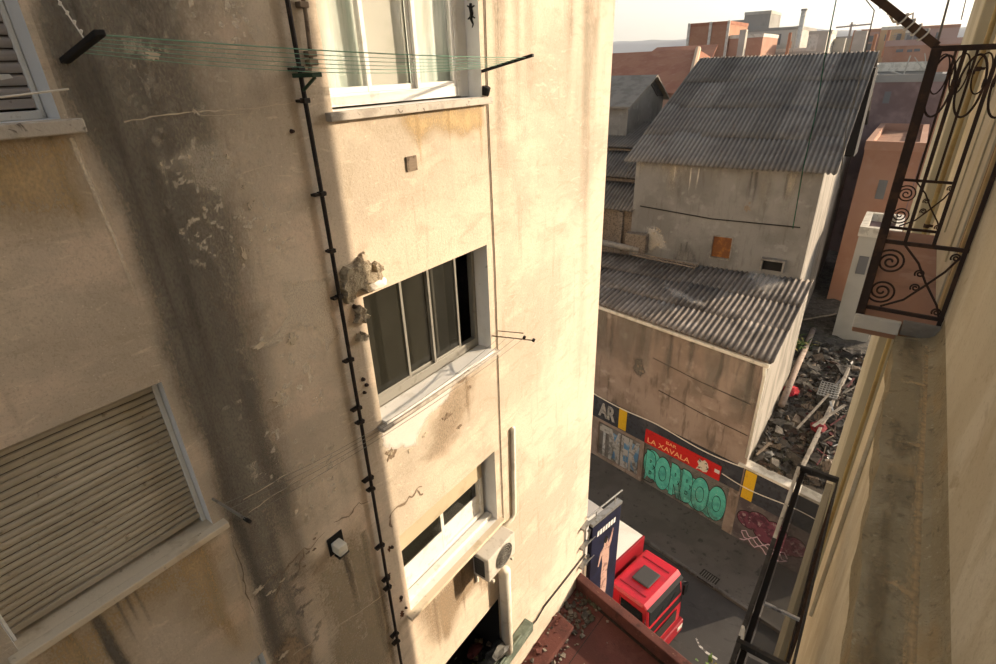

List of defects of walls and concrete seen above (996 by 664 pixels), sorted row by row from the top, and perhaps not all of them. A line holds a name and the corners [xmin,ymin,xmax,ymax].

peeling [183,187,223,253]
water stain [39,0,293,664]
crack [252,502,366,602]
crack [389,486,423,527]